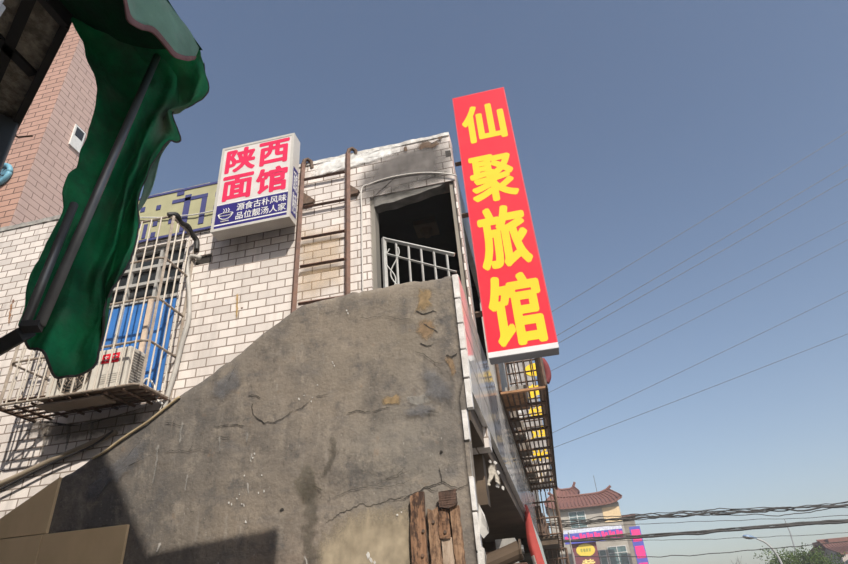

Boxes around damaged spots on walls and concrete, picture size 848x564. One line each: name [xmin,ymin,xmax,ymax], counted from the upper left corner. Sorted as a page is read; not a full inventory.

water stain [315,146,447,196]
spalling [416,289,437,346]
crack [167,394,328,452]
crack [337,467,466,500]